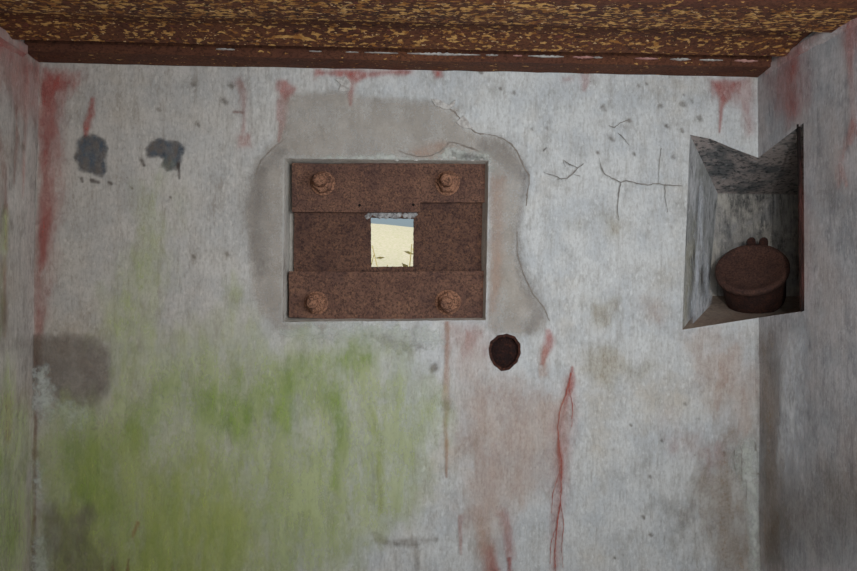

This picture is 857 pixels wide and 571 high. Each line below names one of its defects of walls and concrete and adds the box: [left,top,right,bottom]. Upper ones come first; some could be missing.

crack [544,148,681,217]